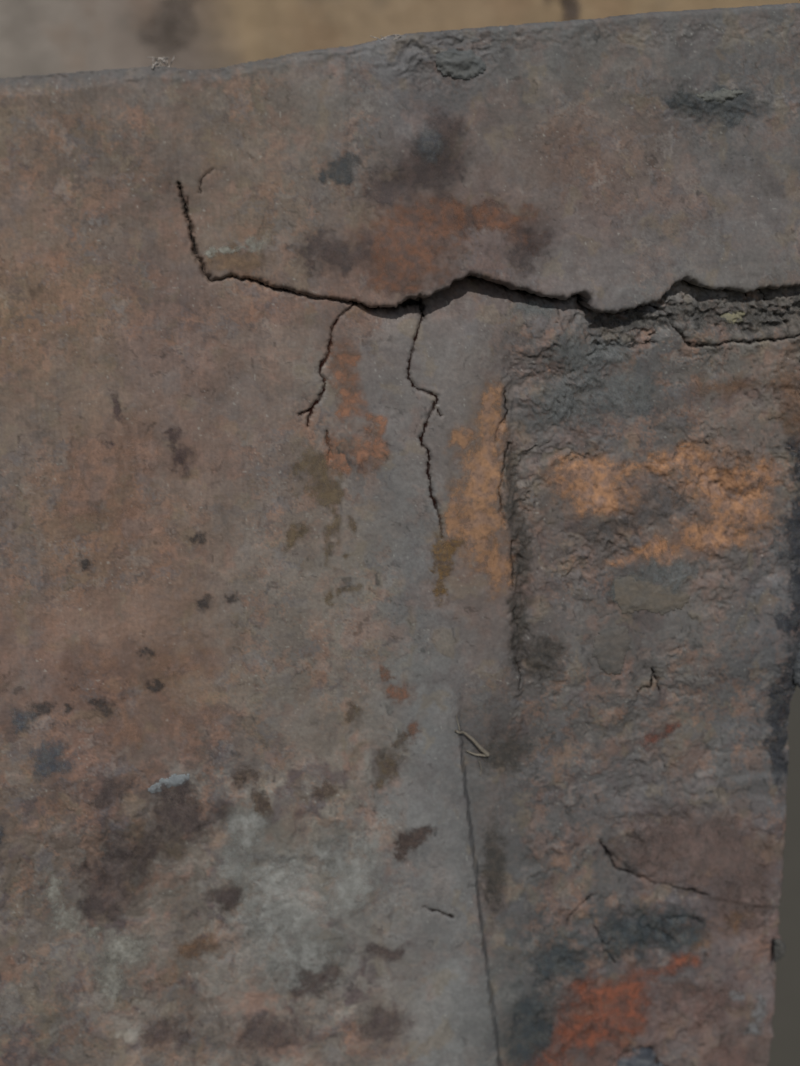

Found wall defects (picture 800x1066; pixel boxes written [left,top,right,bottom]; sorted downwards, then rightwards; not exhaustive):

crack [179,170,294,292]
crack [501,285,582,302]
crack [298,299,443,537]
corrosion [431,385,513,596]
corrosion [551,442,773,565]
crack [599,839,707,941]